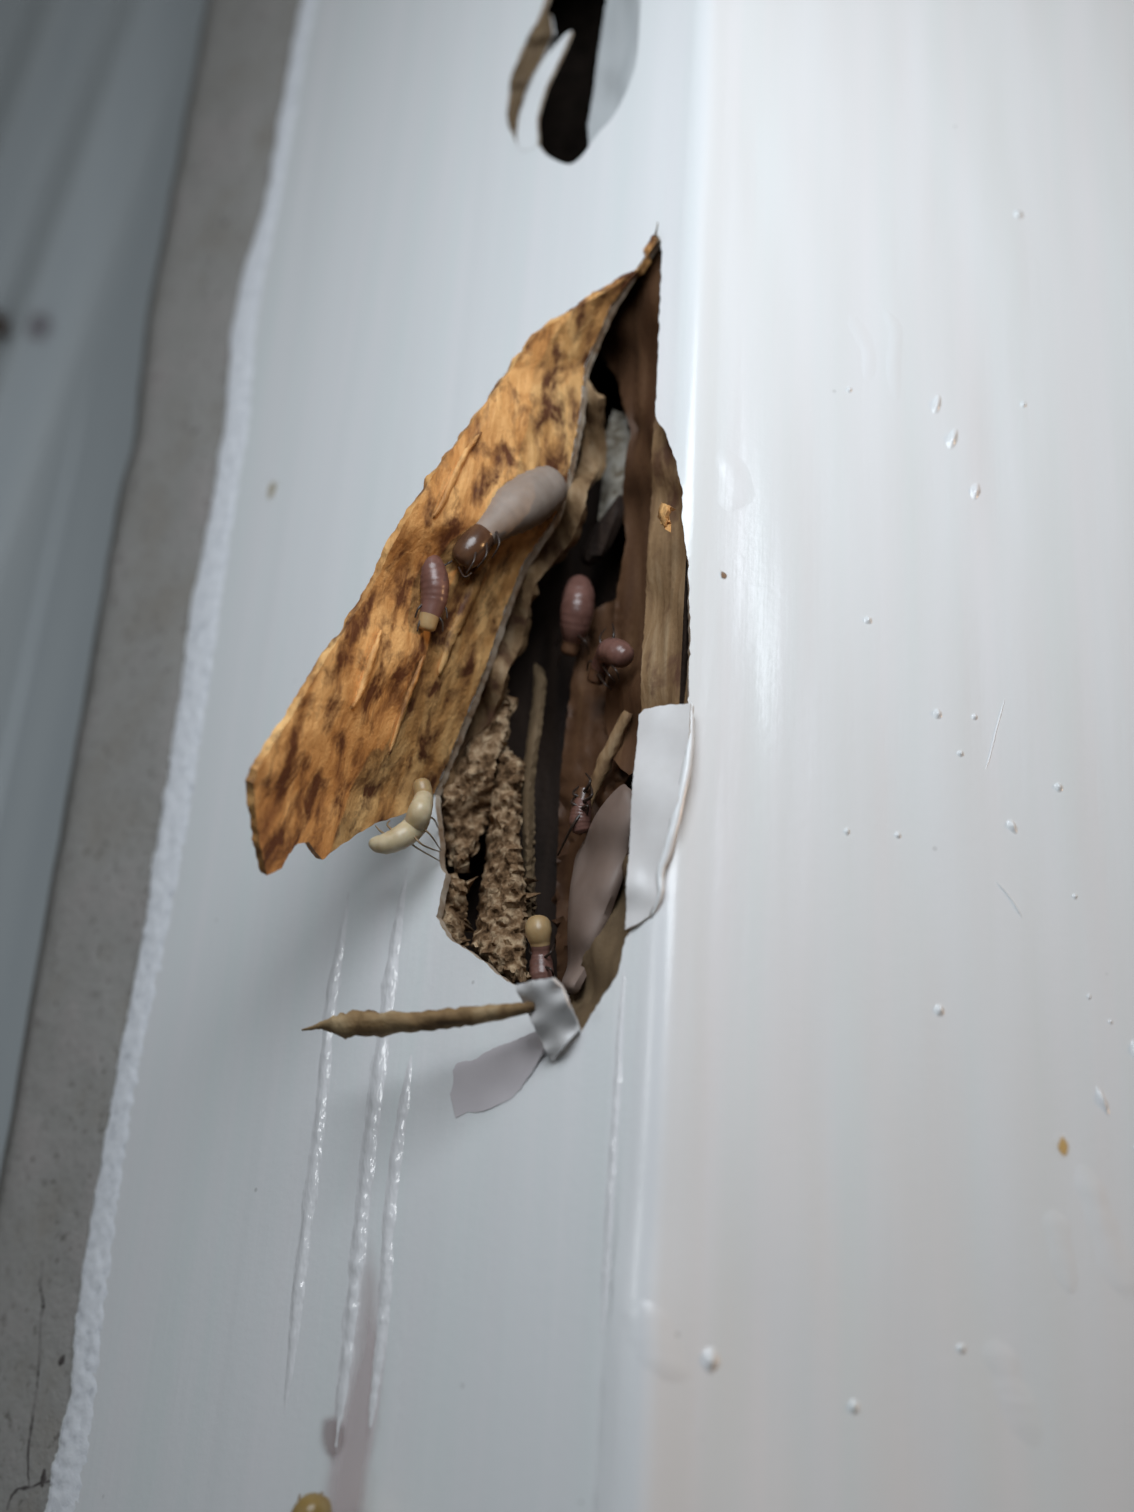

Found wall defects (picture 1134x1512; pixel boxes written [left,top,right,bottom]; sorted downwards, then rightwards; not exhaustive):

peeling [588,0,640,145]
peeling [657,502,676,532]
peeling [625,704,694,931]
peeling [514,978,581,1061]
crack [6,1262,50,1509]